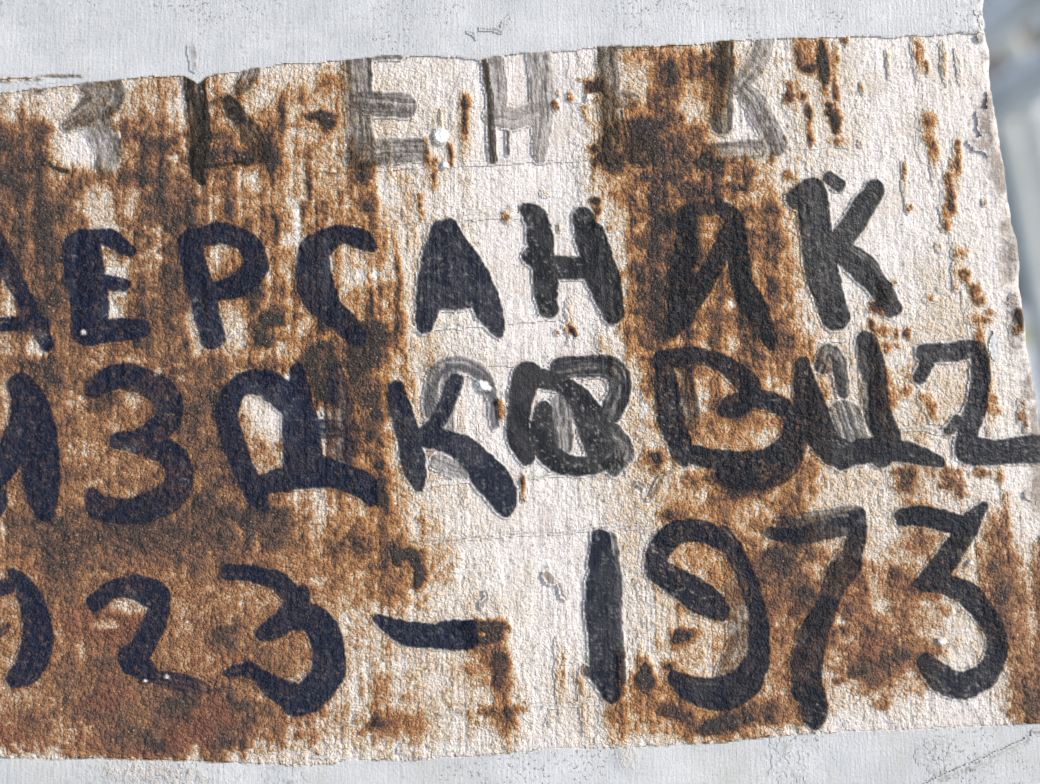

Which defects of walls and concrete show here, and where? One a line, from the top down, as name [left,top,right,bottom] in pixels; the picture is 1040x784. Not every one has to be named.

corrosion [0,61,570,767]
corrosion [553,36,1040,748]